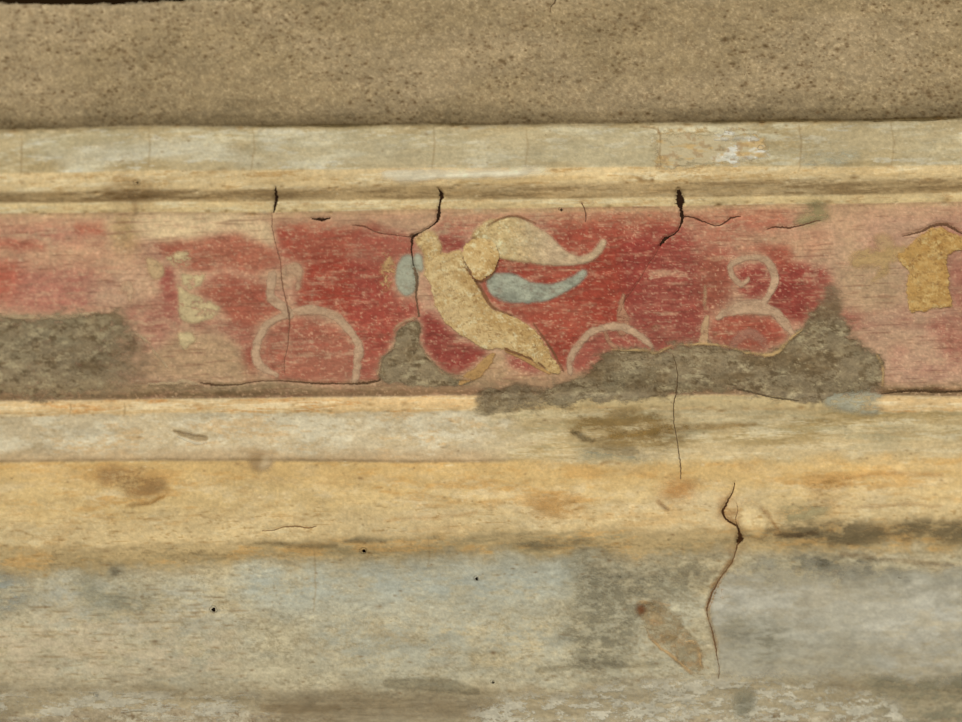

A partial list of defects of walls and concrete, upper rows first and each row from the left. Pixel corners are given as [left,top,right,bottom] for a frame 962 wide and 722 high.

crack [200,186,381,386]
crack [355,189,444,317]
crack [660,189,739,246]
flaking render [0,308,168,403]
flaking render [377,318,470,387]
flaking render [476,296,884,415]
damp [103,471,163,503]
crack [706,483,744,678]